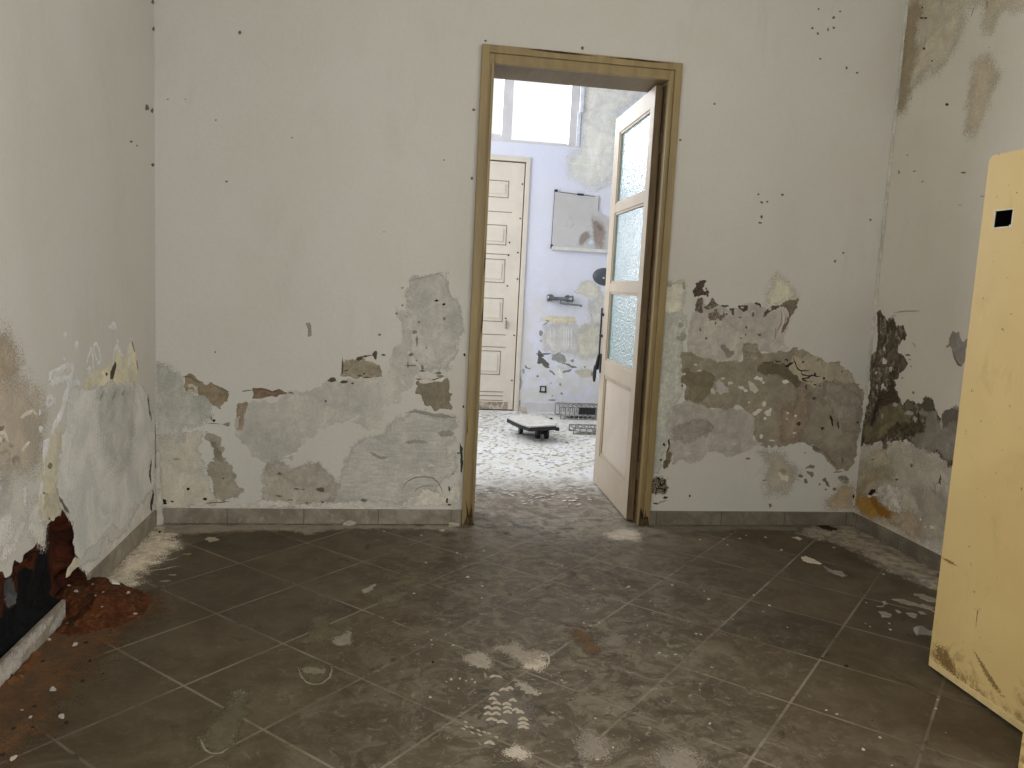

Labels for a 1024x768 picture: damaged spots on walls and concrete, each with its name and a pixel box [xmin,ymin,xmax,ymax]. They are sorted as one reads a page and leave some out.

damp [897,0,1024,142]
damp [0,323,52,567]
peeling [0,321,155,659]
damp [80,362,461,573]
peeling [182,272,466,464]
spalling [519,330,593,406]
peeling [667,280,864,471]
damp [745,310,959,553]
spalling [867,479,903,514]
spalling [946,331,968,366]
damp [0,553,191,768]